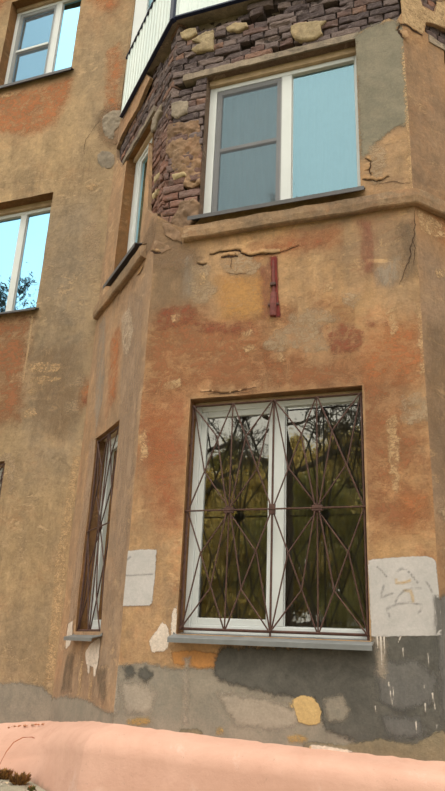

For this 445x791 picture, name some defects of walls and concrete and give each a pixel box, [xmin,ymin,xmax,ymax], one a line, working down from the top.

spalling [98,0,445,228]
crack [362,154,406,183]
crack [197,240,299,275]
crack [399,211,416,285]